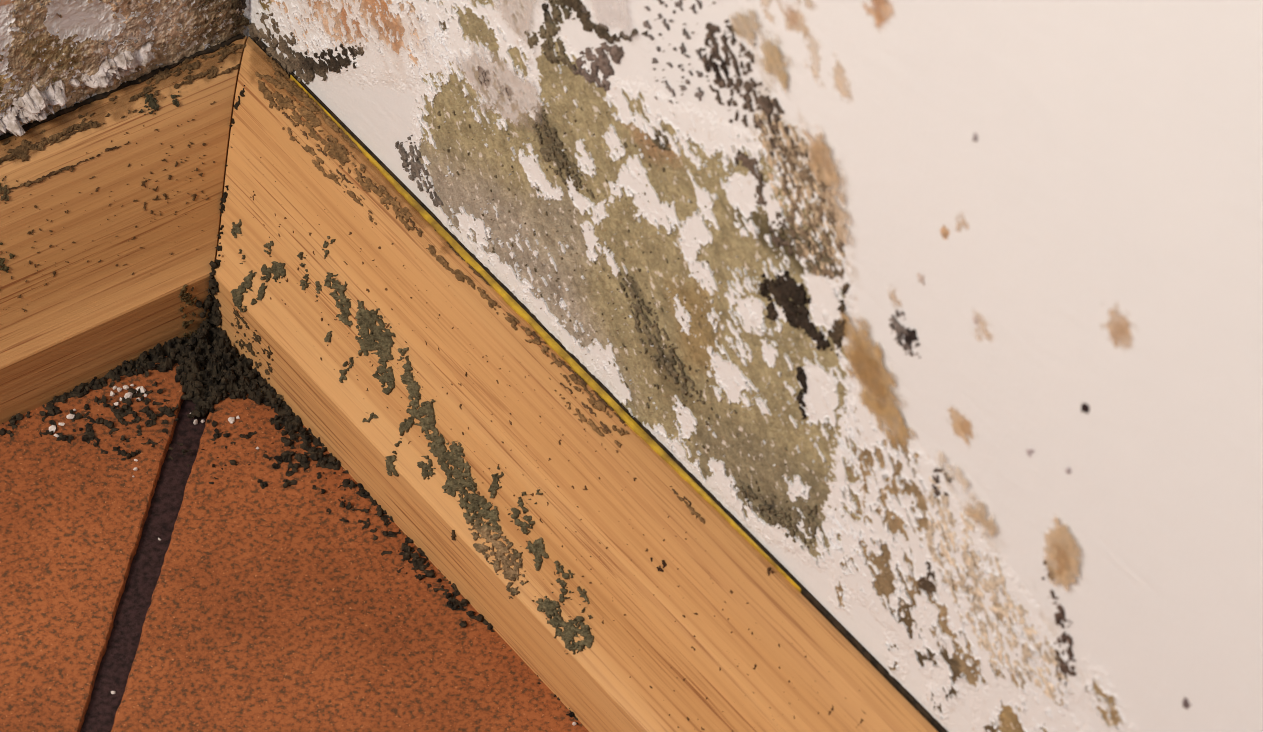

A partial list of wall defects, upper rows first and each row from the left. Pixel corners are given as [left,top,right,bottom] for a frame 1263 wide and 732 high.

water stain [0,0,629,655]
water stain [461,55,737,426]
water stain [643,0,913,446]
water stain [888,292,921,359]
water stain [663,495,704,541]
water stain [731,443,823,548]
water stain [921,454,1080,700]